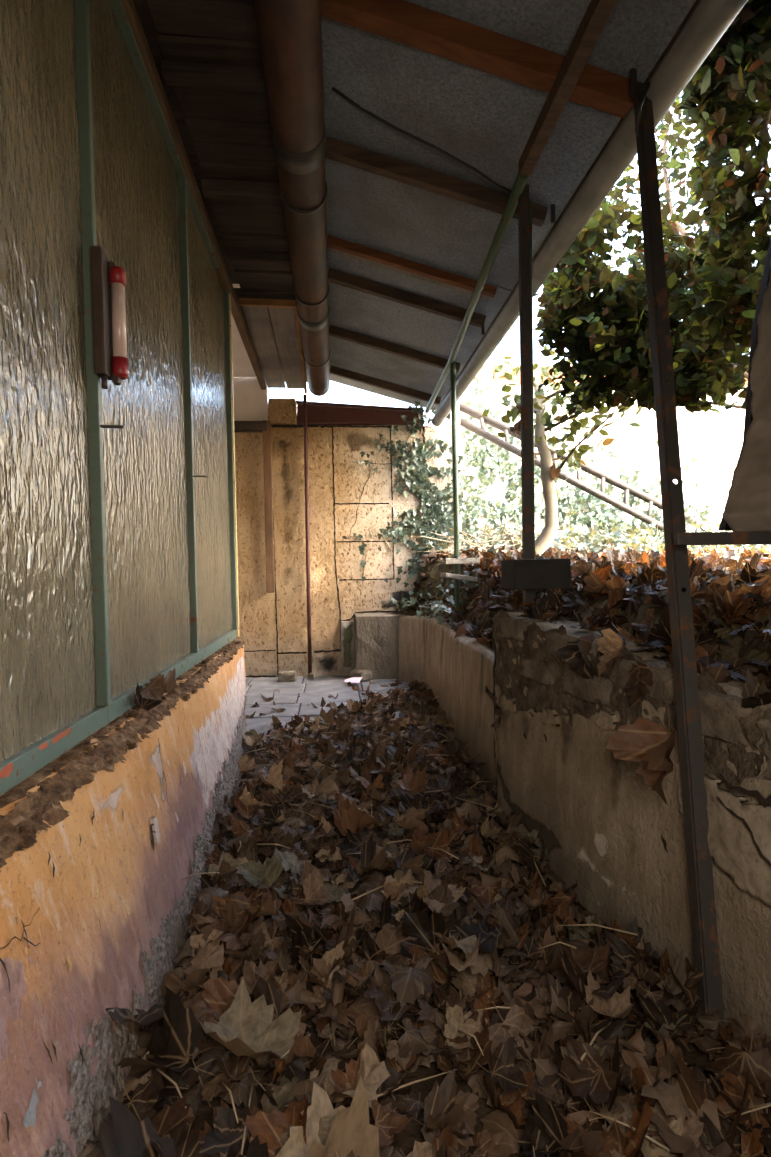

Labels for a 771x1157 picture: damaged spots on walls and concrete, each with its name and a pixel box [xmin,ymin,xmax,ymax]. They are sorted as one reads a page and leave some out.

spalling [492,609,678,746]
spalling [698,671,771,790]
crack [717,774,771,867]
crack [0,907,40,991]
spalling [0,639,247,1157]